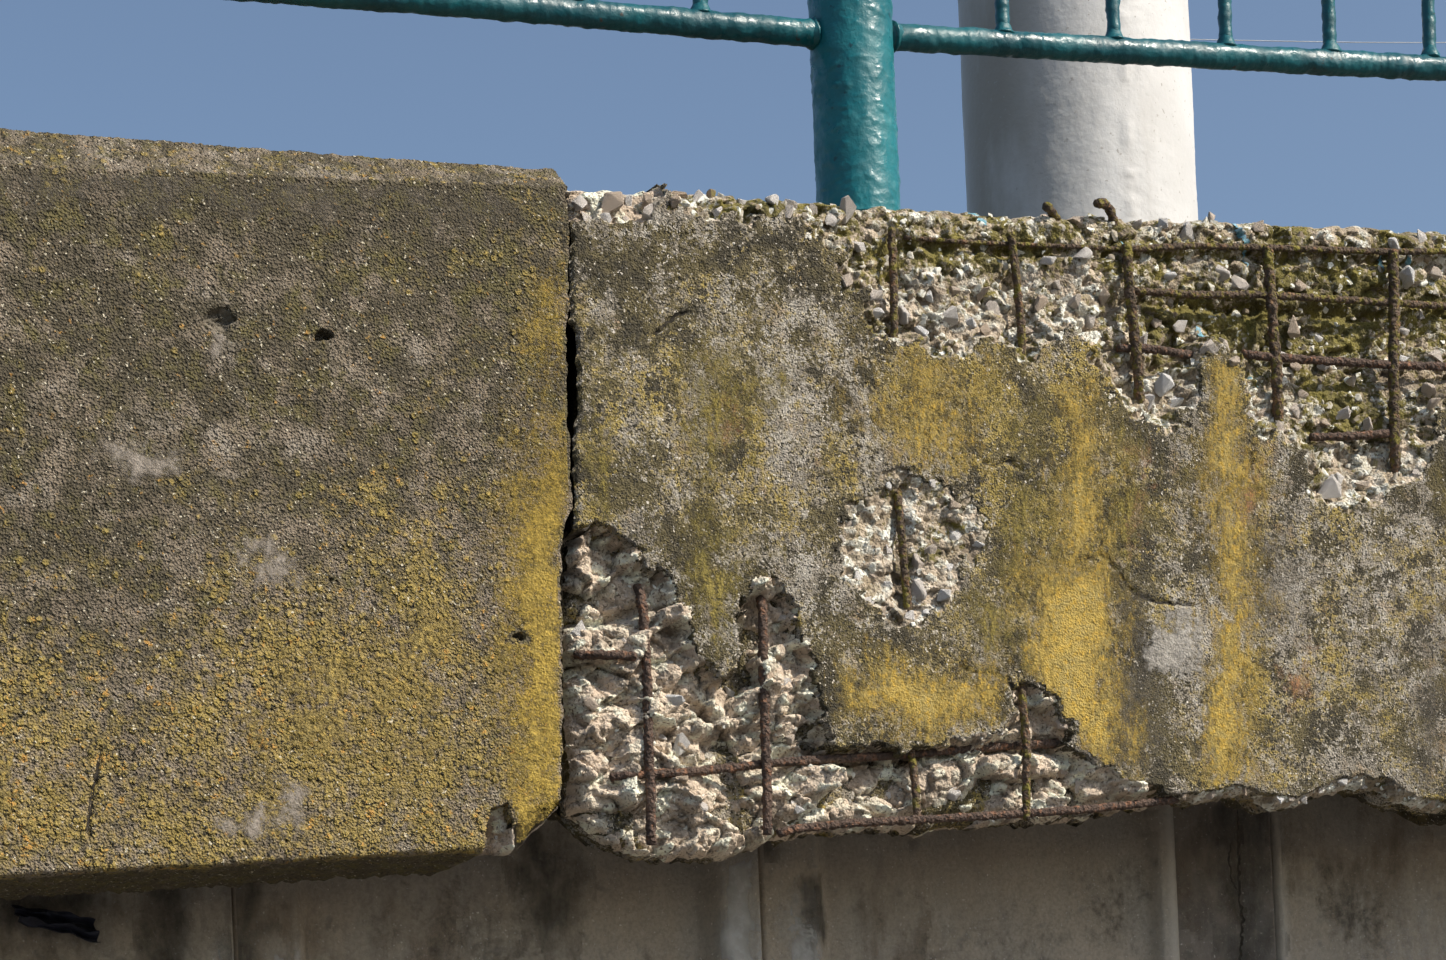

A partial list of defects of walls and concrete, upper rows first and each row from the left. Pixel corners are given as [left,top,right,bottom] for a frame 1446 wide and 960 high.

spalling [565,187,1446,518]
spalling [834,468,989,628]
spalling [478,525,1446,864]